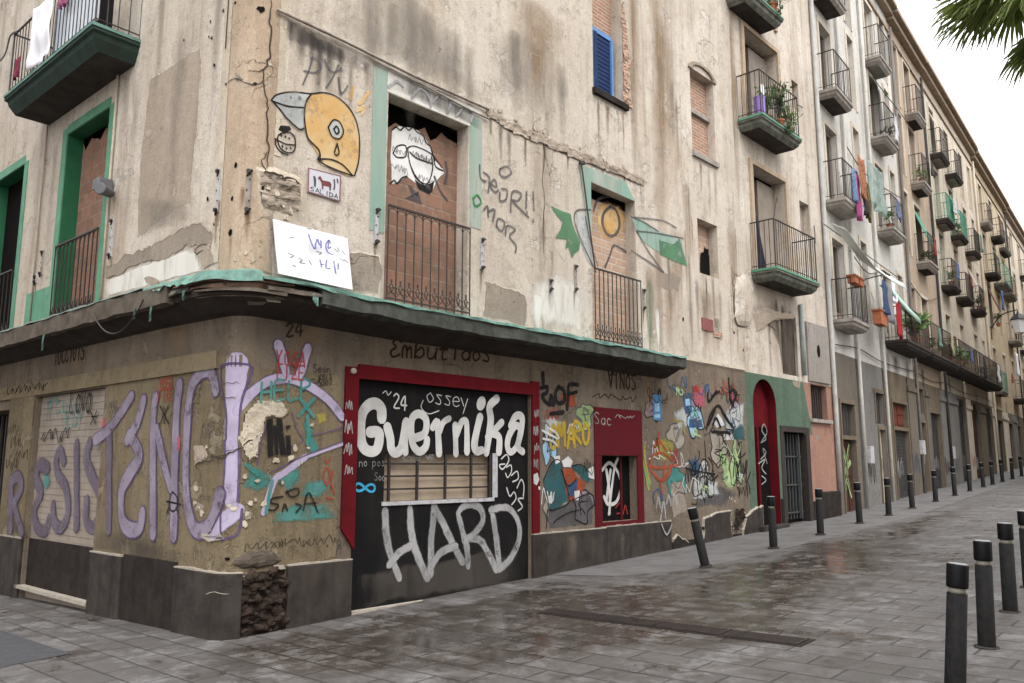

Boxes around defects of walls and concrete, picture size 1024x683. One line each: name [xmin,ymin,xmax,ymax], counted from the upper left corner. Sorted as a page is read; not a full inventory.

peeling [106,47,214,278]
crack [224,0,272,187]
spalling [234,166,308,274]
spalling [237,396,290,483]